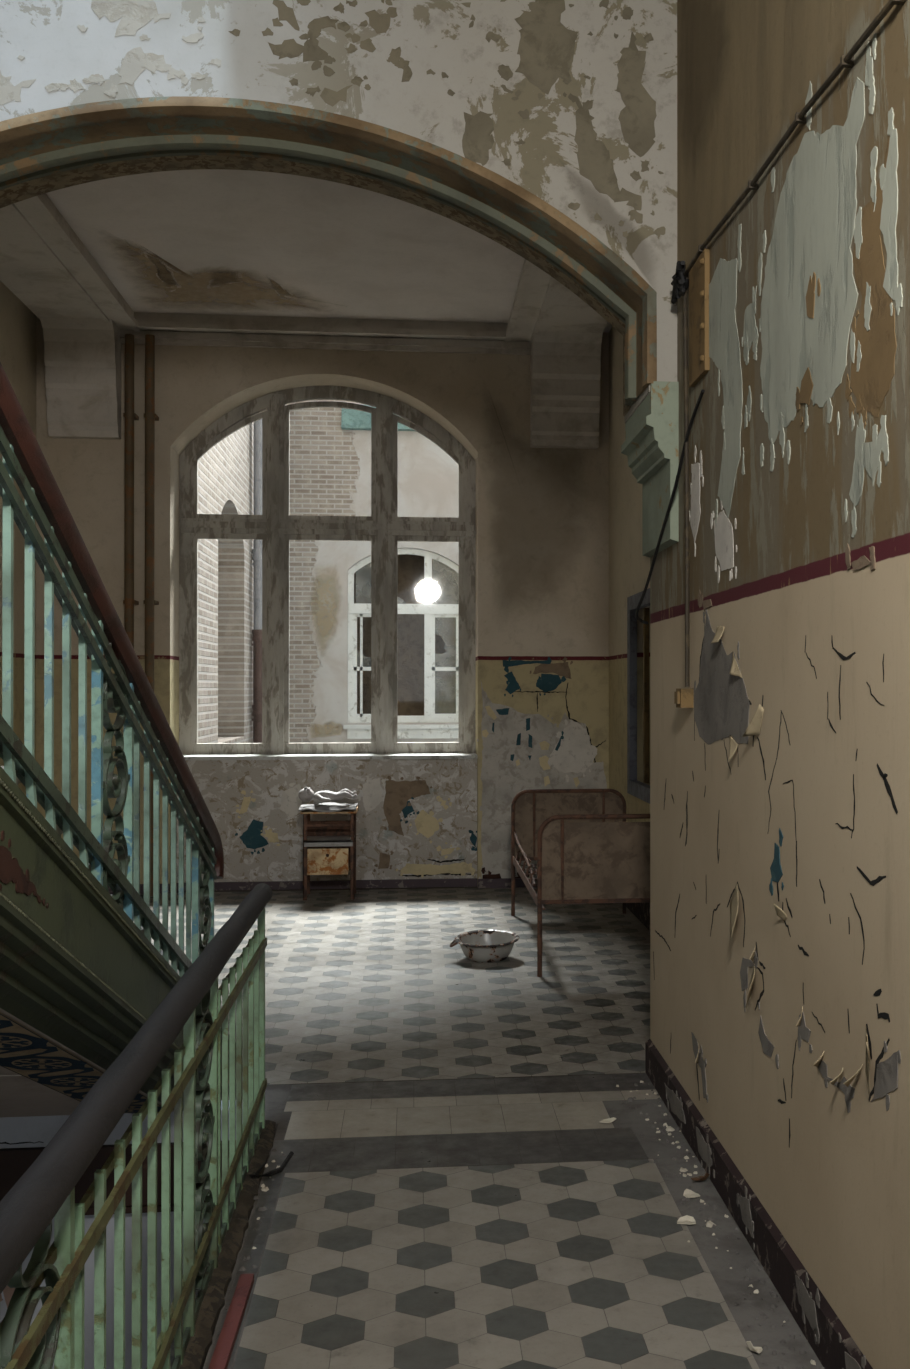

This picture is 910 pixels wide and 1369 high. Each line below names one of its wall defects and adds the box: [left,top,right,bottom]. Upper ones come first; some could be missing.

peeling [0,0,222,105]
peeling [262,0,455,107]
peeling [461,2,502,42]
peeling [462,111,525,166]
peeling [498,0,666,238]
peeling [689,33,903,583]
peeling [694,589,750,761]
peeling [358,656,607,879]
peeling [235,790,268,855]
peeling [769,828,784,896]
peeling [740,951,779,1069]
peeling [795,1006,901,1113]